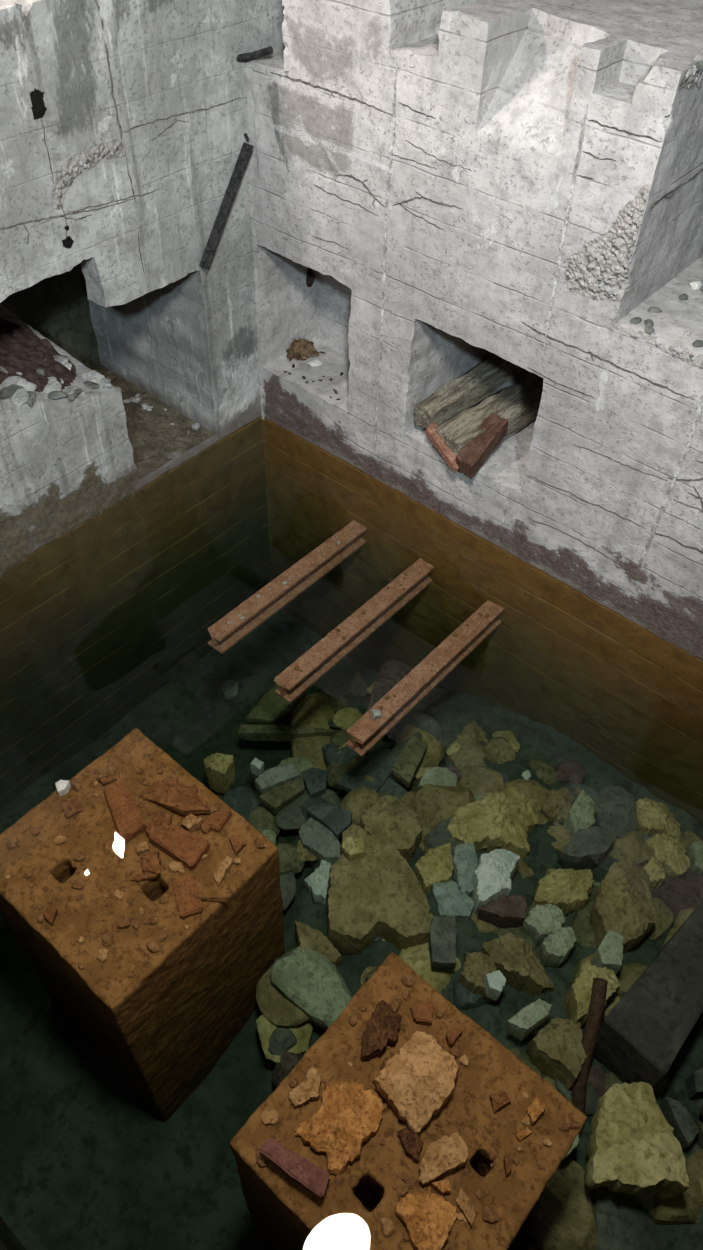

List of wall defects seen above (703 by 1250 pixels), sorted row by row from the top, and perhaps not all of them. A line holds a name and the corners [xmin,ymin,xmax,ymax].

spalling [51,139,125,210]
spalling [62,225,74,249]
spalling [564,184,650,301]
crack [520,321,694,400]
water stain [219,354,703,662]
crack [528,517,621,565]
crack [530,476,703,554]
crack [573,444,703,513]